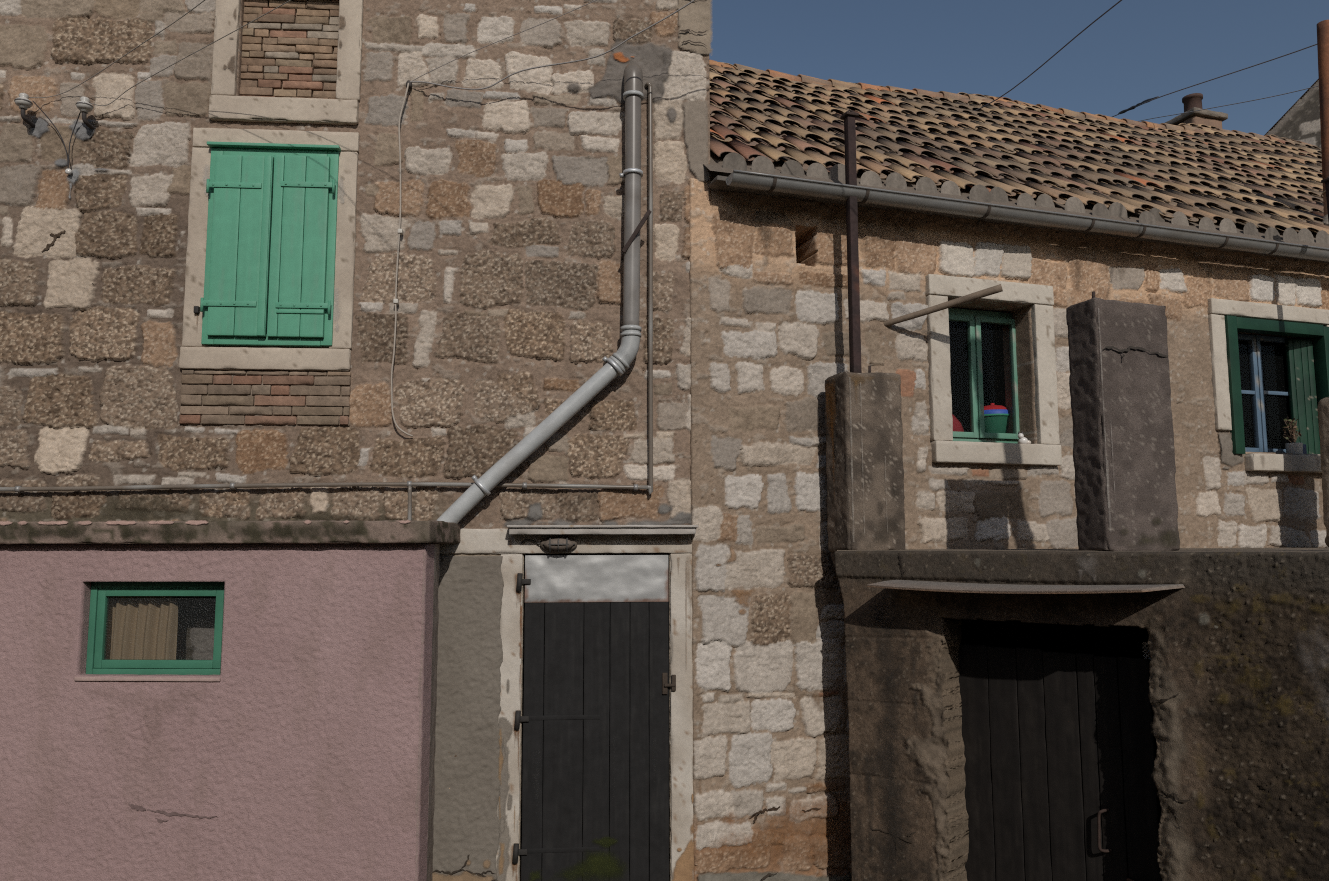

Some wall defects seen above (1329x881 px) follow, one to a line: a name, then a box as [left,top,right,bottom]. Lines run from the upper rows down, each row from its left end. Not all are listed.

crack [129,804,216,823]